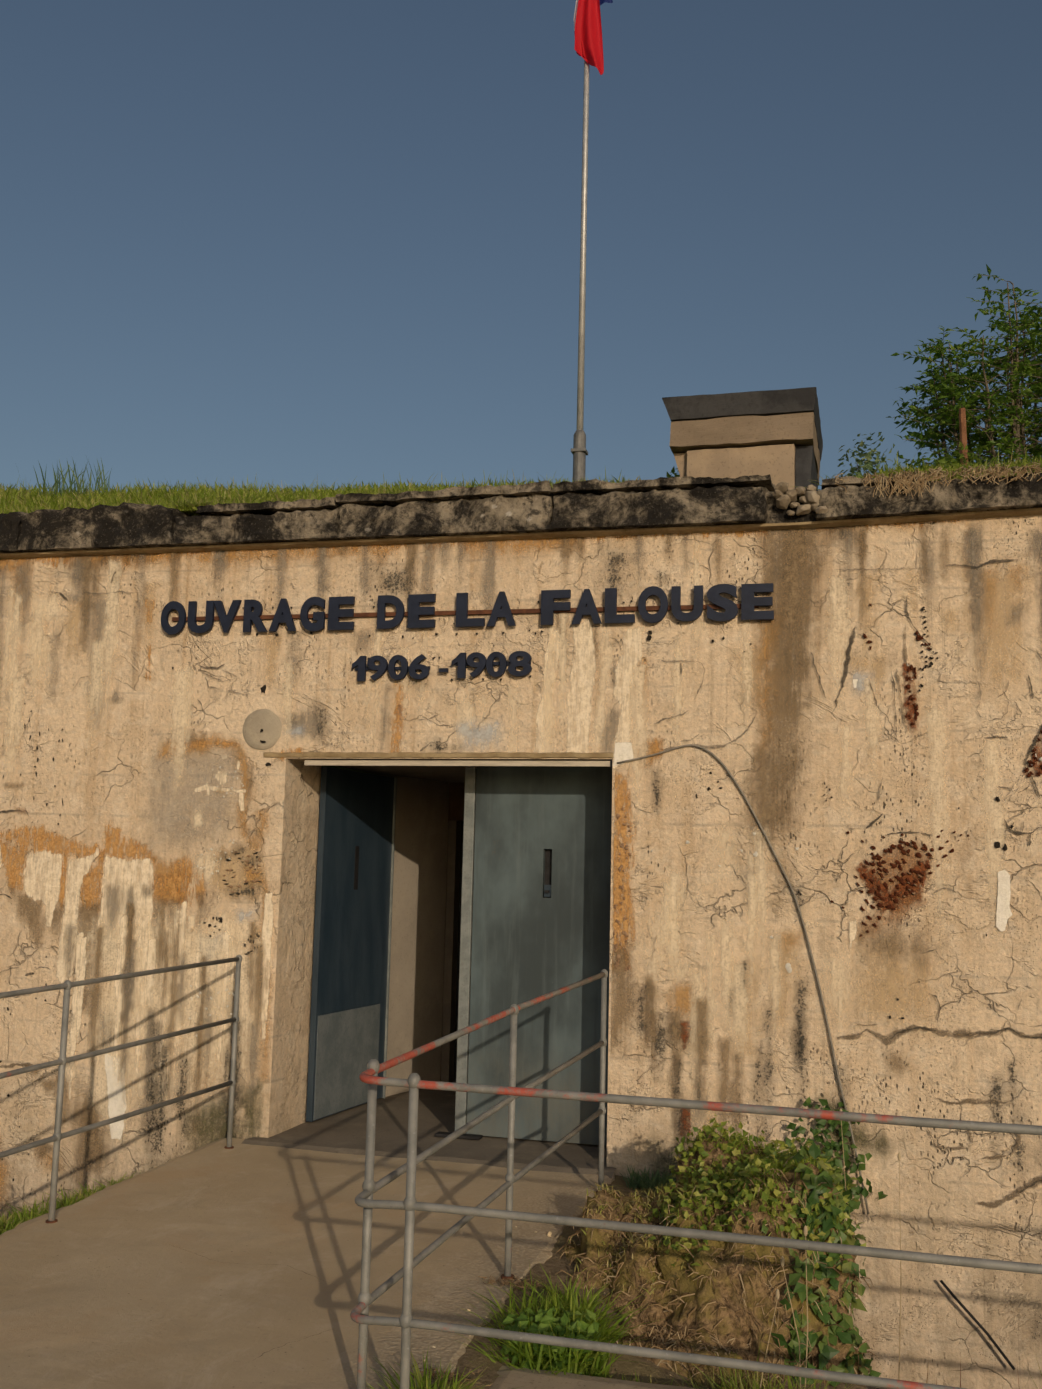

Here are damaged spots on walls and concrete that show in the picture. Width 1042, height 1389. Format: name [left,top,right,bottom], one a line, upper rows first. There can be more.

crack [811,559,1020,743]
spalling [197,839,263,897]
water stain [0,520,1023,1214]
crack [849,783,934,836]
rust [831,830,969,937]
crack [968,651,1042,846]
crack [0,967,53,1090]
peeling [23,848,259,1140]
crack [837,994,1042,1045]